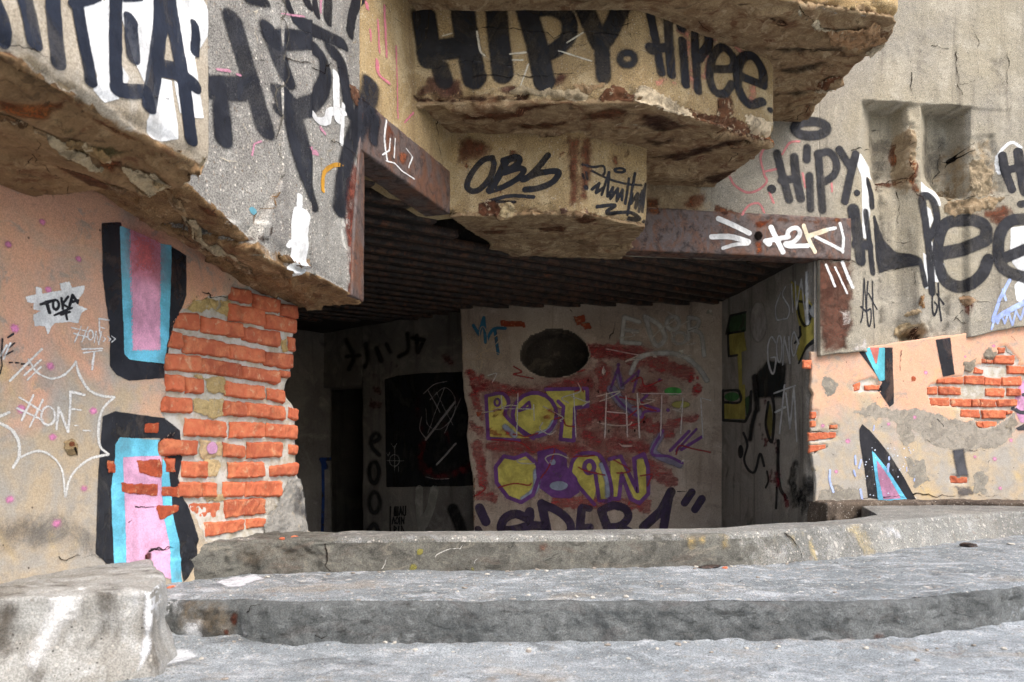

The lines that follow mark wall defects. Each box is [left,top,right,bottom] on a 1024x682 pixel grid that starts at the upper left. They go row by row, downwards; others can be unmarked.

spalling [509,82,775,145]
spalling [0,114,256,277]
rust [345,164,357,247]
rust [459,137,489,168]
rust [560,139,592,205]
rust [684,195,733,214]
rust [820,260,852,350]
flaking render [158,287,299,537]
flaking render [807,411,838,453]
peeling [822,376,838,396]
peeling [853,347,1024,488]
peeling [950,471,989,494]